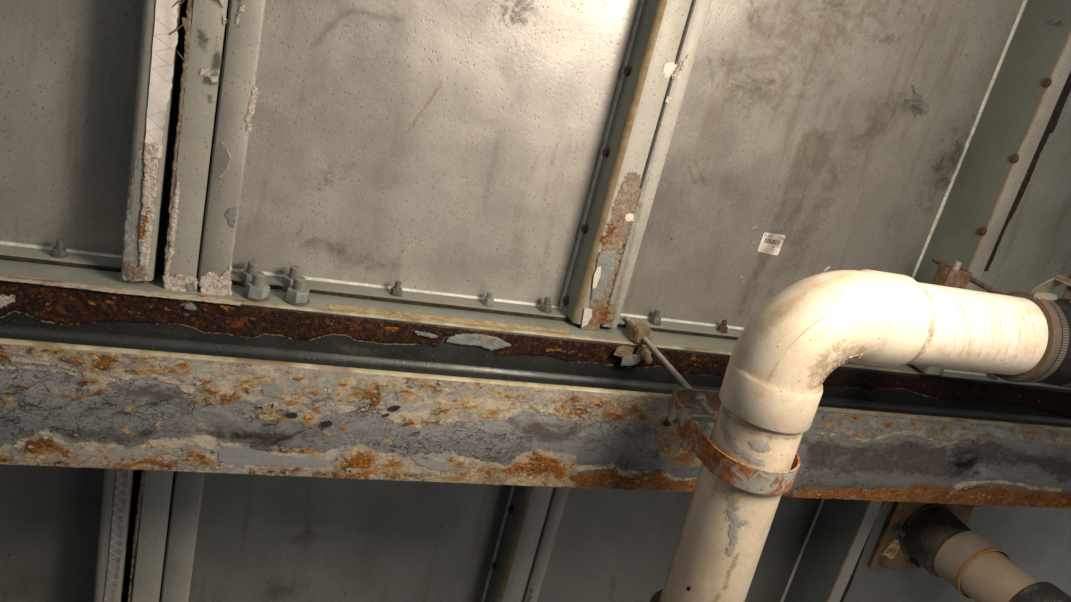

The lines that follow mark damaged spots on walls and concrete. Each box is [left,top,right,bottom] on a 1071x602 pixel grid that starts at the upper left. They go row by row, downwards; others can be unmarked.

rust [580,171,642,332]
rust [29,347,535,426]
peeling [0,344,672,429]
rust [0,434,87,466]
rust [101,448,226,470]
peeling [0,427,578,488]
rust [250,396,701,493]
peeling [811,412,1071,449]
rust [792,478,1071,509]